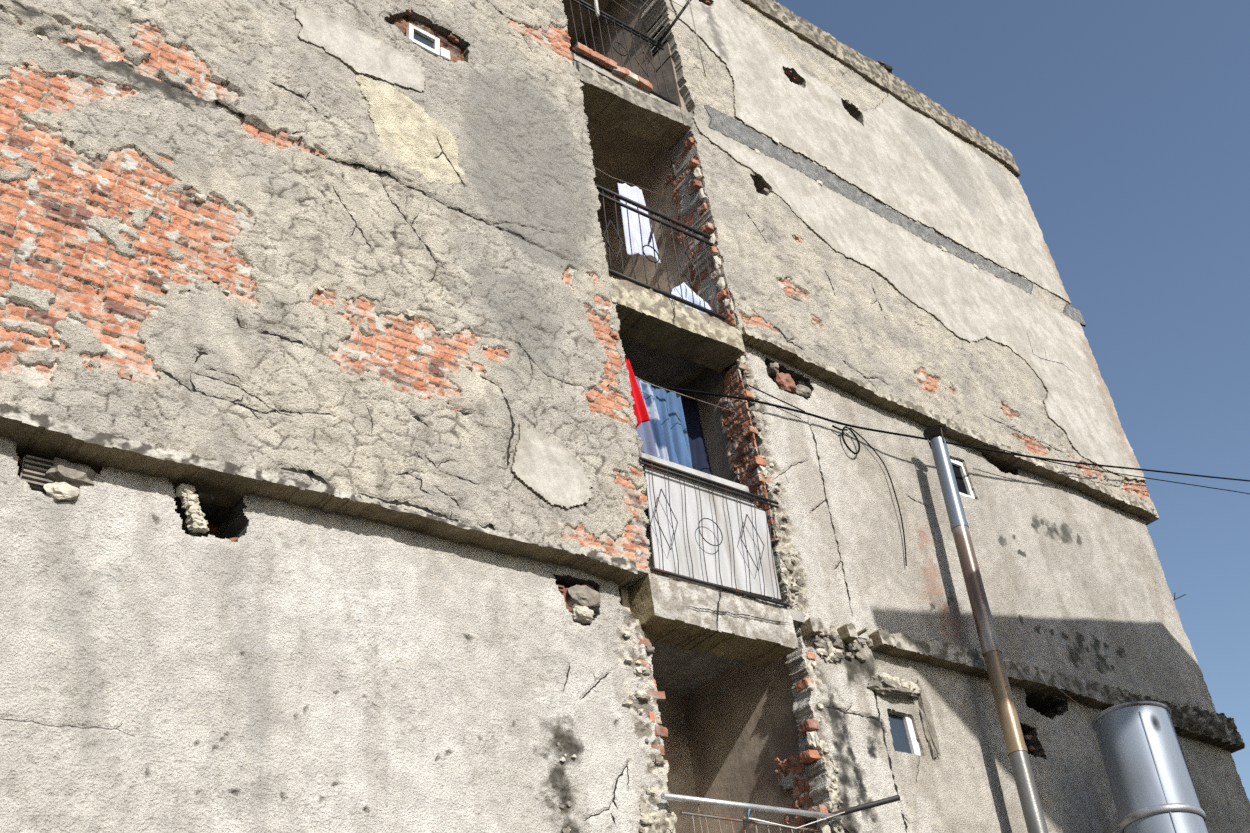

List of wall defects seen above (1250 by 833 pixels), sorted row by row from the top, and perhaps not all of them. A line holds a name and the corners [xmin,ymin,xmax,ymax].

crack [166,78,244,120]
flaking render [0,21,325,394]
crack [269,81,568,281]
flaking render [665,0,1152,501]
crack [160,350,332,419]
flaking render [311,281,510,411]
spalling [17,455,99,502]
spalling [175,484,237,542]
crack [280,467,328,485]
crack [359,416,496,530]
flaking render [510,423,652,570]
crack [776,419,853,615]